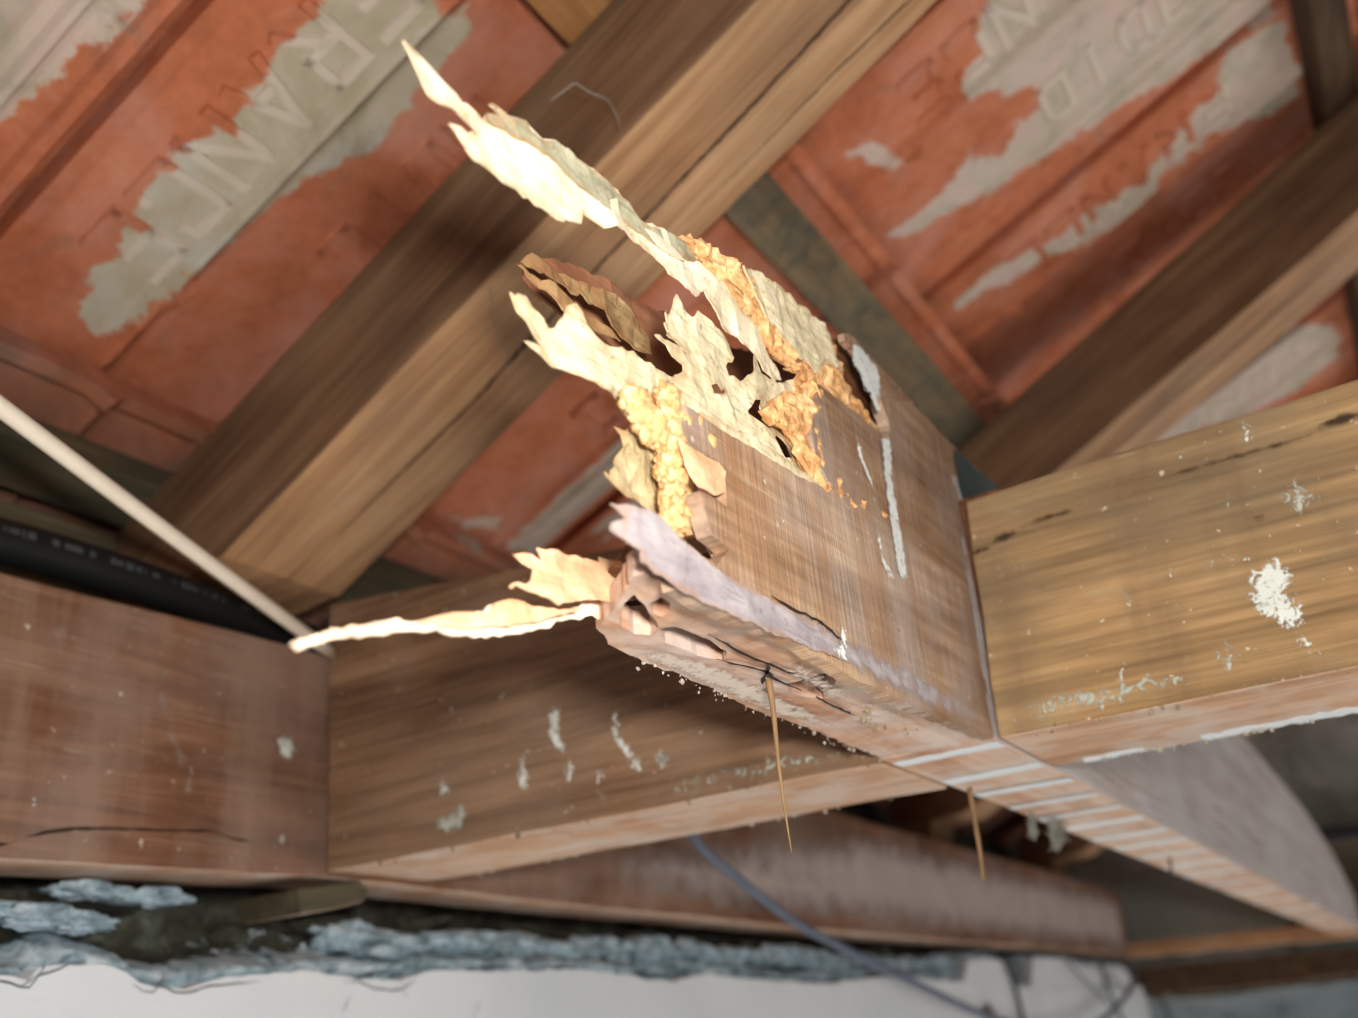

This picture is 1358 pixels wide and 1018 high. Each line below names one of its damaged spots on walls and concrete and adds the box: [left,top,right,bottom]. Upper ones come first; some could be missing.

peeling [678,438,726,496]
peeling [508,548,616,605]
peeling [610,503,844,660]
crack [0,827,259,846]
spalling [0,879,1120,988]